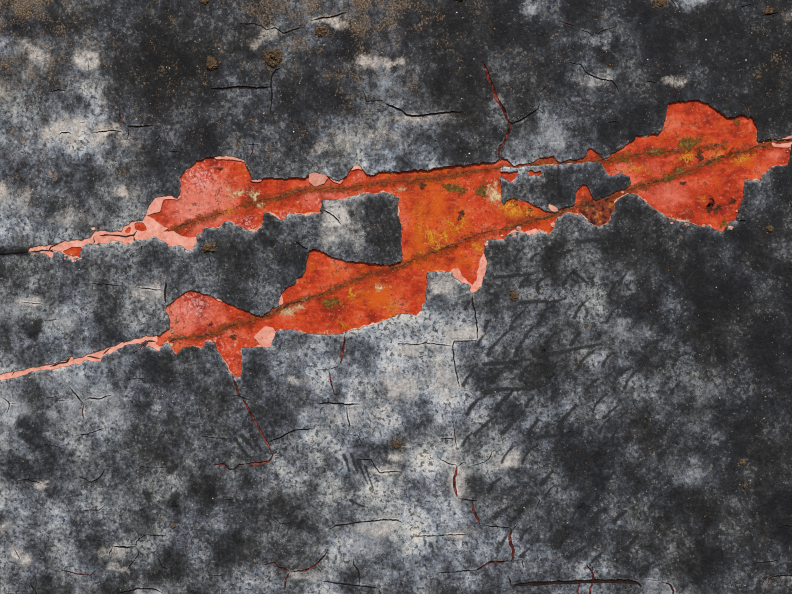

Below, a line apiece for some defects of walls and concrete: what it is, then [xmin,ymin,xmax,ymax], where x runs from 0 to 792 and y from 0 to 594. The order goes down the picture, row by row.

crack [239,11,347,36]
crack [211,66,283,113]
crack [361,89,463,119]
crack [480,60,545,160]
peeling [0,100,792,380]
crack [396,292,480,388]
crack [42,376,147,450]
crack [213,376,315,472]
crack [317,332,401,475]
crack [329,422,676,594]
crack [60,533,166,594]
crack [261,549,383,594]